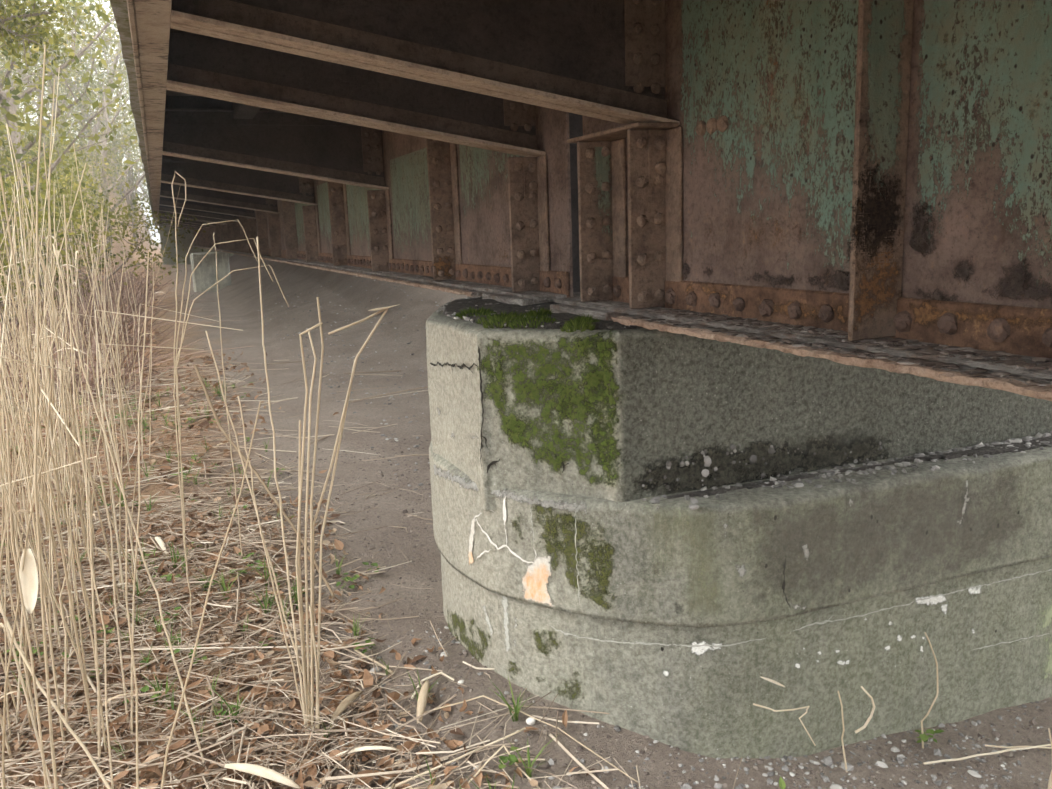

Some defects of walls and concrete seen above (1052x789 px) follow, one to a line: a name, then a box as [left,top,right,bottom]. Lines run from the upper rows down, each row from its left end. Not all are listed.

peeling [679,0,859,273]
peeling [915,0,1052,308]
corrosion [809,137,936,330]
corrosion [984,259,1052,301]
crack [430,347,500,473]
crack [474,496,536,563]
crack [573,505,581,603]